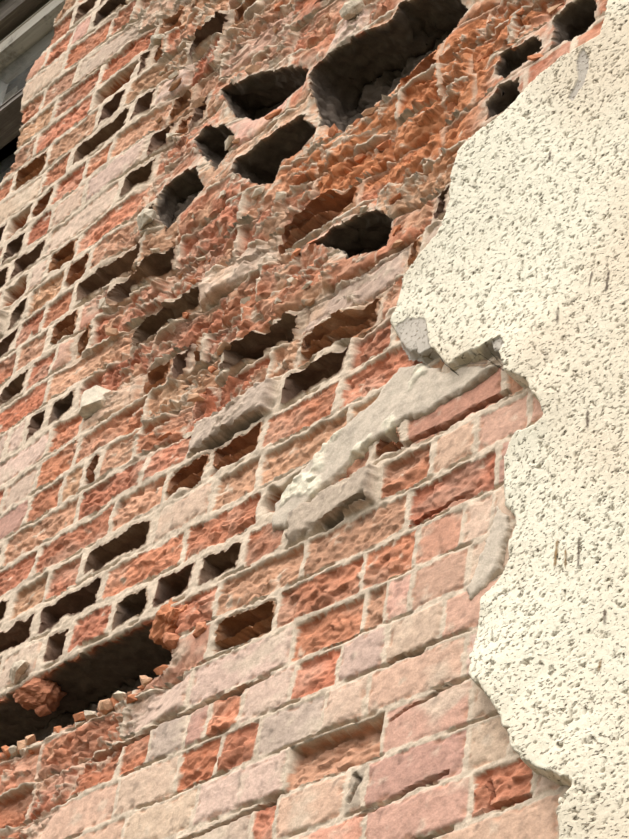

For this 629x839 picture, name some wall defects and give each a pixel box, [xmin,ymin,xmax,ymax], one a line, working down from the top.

spalling [0,210,52,287]
spalling [73,0,597,482]
spalling [0,614,34,652]
spalling [0,503,115,600]
spalling [38,577,101,633]
spalling [44,588,147,662]
spalling [84,521,150,574]
spalling [100,492,261,606]
spalling [215,443,496,701]
spalling [390,200,577,839]
spalling [0,658,188,839]
spalling [176,690,259,794]